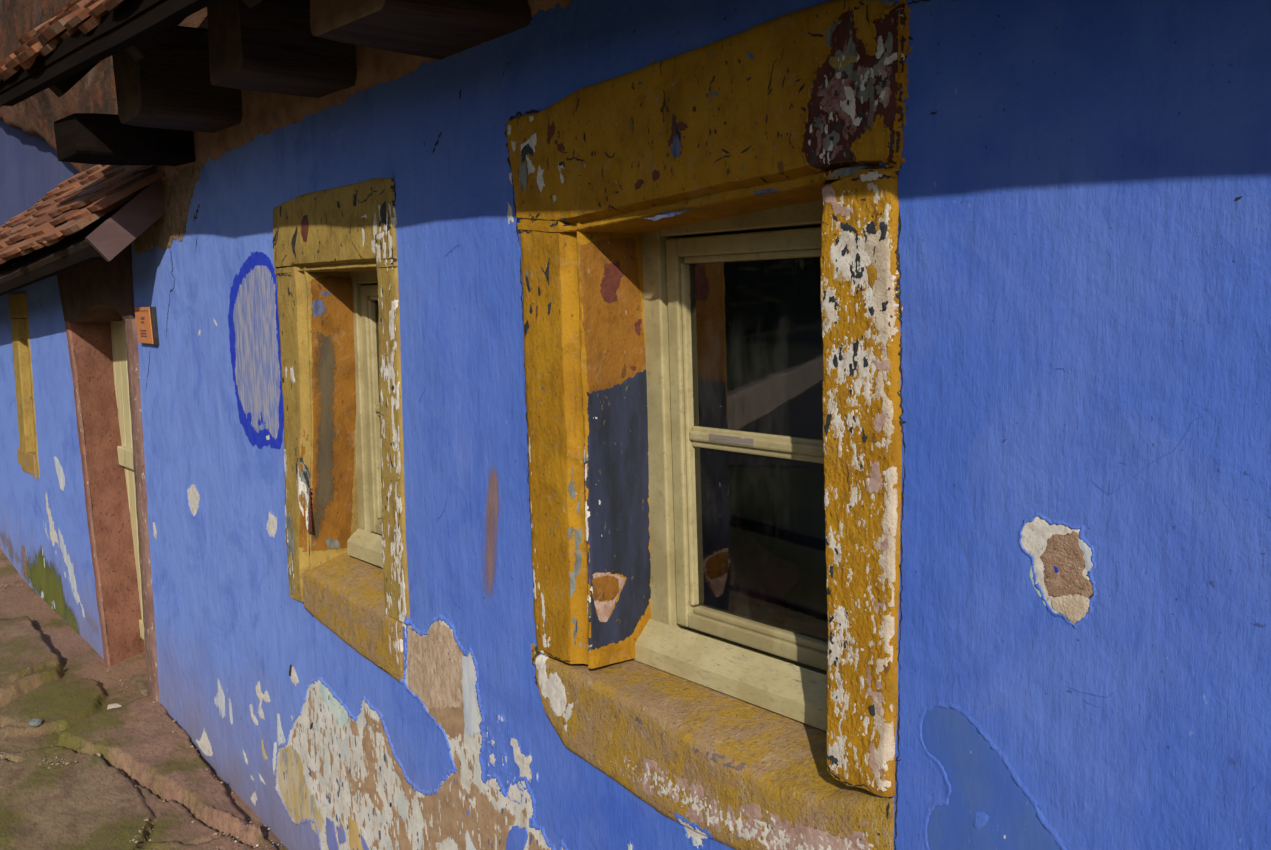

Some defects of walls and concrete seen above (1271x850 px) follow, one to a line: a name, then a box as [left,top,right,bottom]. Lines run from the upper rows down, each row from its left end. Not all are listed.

spalling [507,98,595,224]
peeling [43,456,85,618]
peeling [70,338,109,661]
peeling [243,187,574,850]
spalling [549,443,593,651]
peeling [727,0,913,793]
flaking render [1017,512,1098,629]
peeling [597,755,880,850]